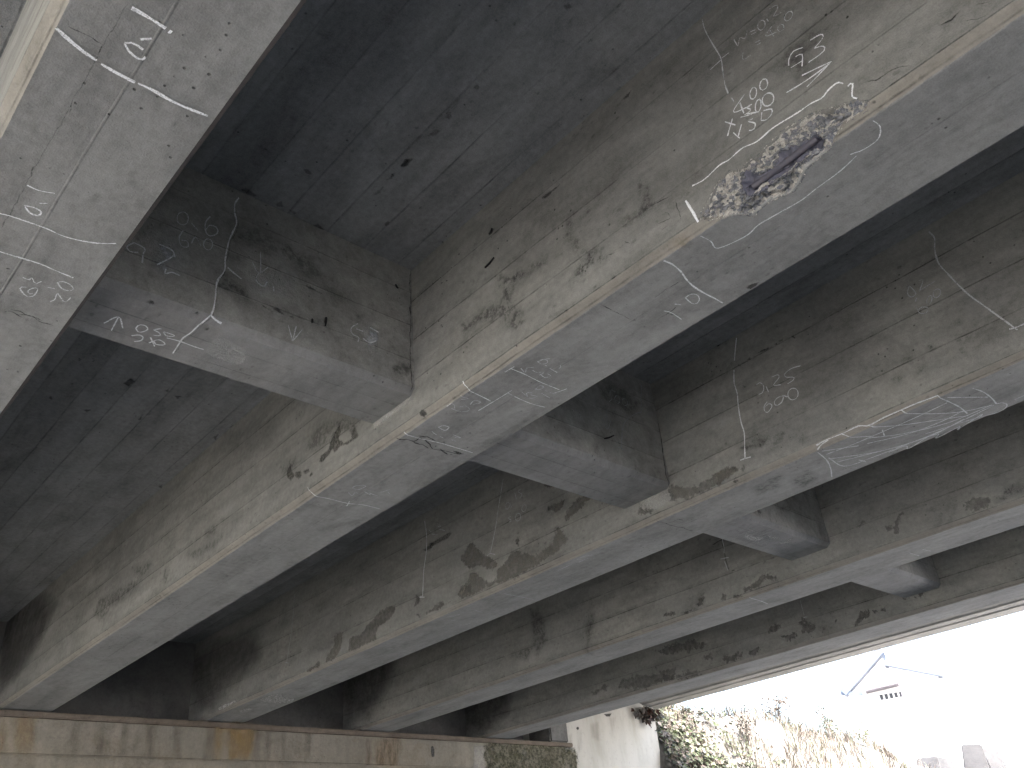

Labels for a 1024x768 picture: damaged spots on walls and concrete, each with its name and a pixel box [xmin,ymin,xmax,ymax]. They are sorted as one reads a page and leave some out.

spalling [700,99,870,221]
damp [320,425,357,462]
crack [397,436,460,455]